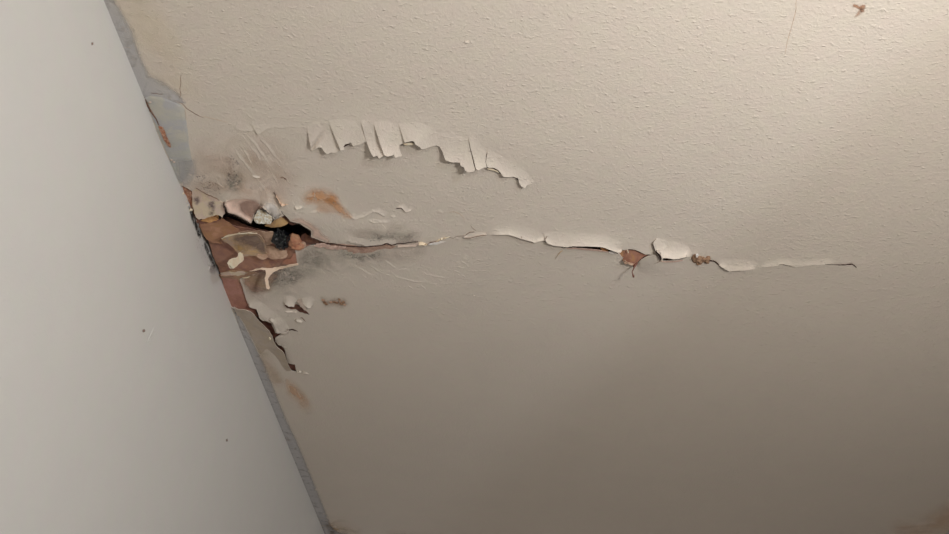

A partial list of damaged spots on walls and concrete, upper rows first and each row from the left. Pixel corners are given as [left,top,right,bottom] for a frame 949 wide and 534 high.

peeling [307,119,535,188]
peeling [192,189,225,219]
leakage [195,158,253,222]
peeling [221,209,298,289]
crack [327,224,857,273]
peeling [282,294,346,322]